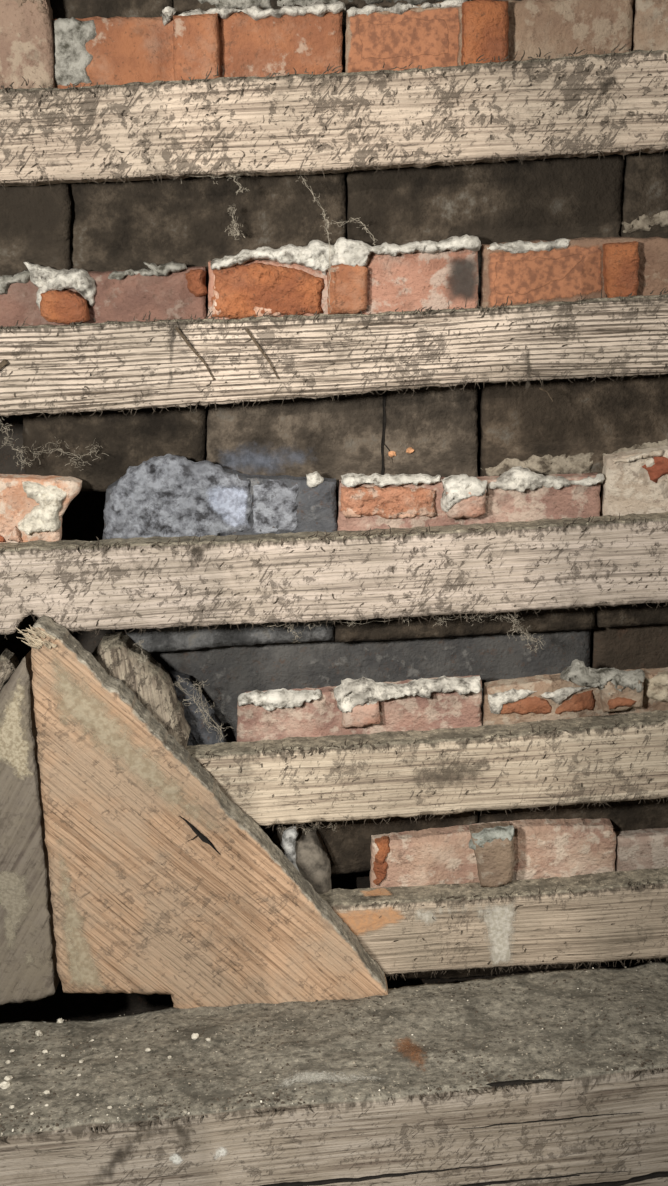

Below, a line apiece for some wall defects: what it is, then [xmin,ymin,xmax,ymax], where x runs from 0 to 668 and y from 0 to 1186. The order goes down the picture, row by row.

crack [260,1164,668,1186]